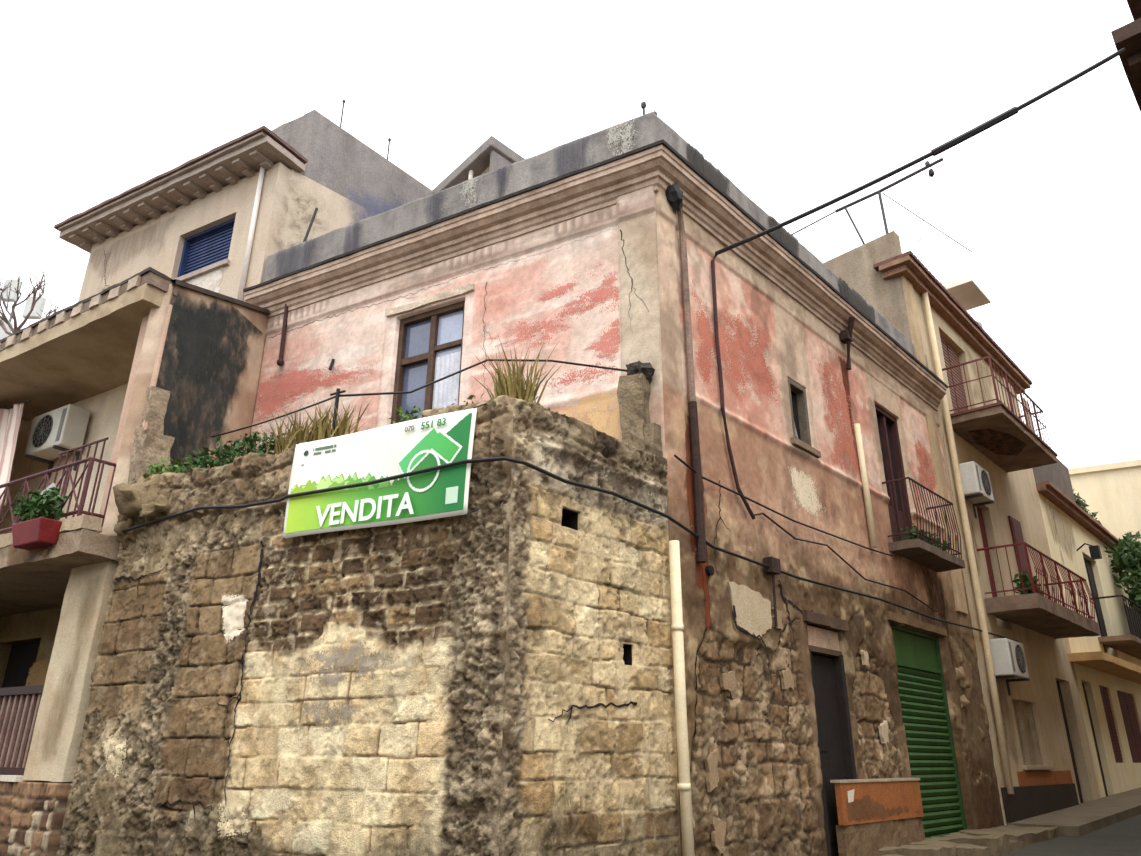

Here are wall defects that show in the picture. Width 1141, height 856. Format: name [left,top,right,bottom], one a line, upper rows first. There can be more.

leakage [271,172,331,275]
leakage [687,143,729,195]
leakage [156,293,262,472]
leakage [251,357,377,432]
crack [269,229,649,398]
rust [685,416,711,631]
flaking render [25,659,49,686]
crack [157,541,264,824]
crack [548,701,637,730]
spalling [690,582,823,856]
spalling [853,641,905,779]
peeling [846,794,919,823]